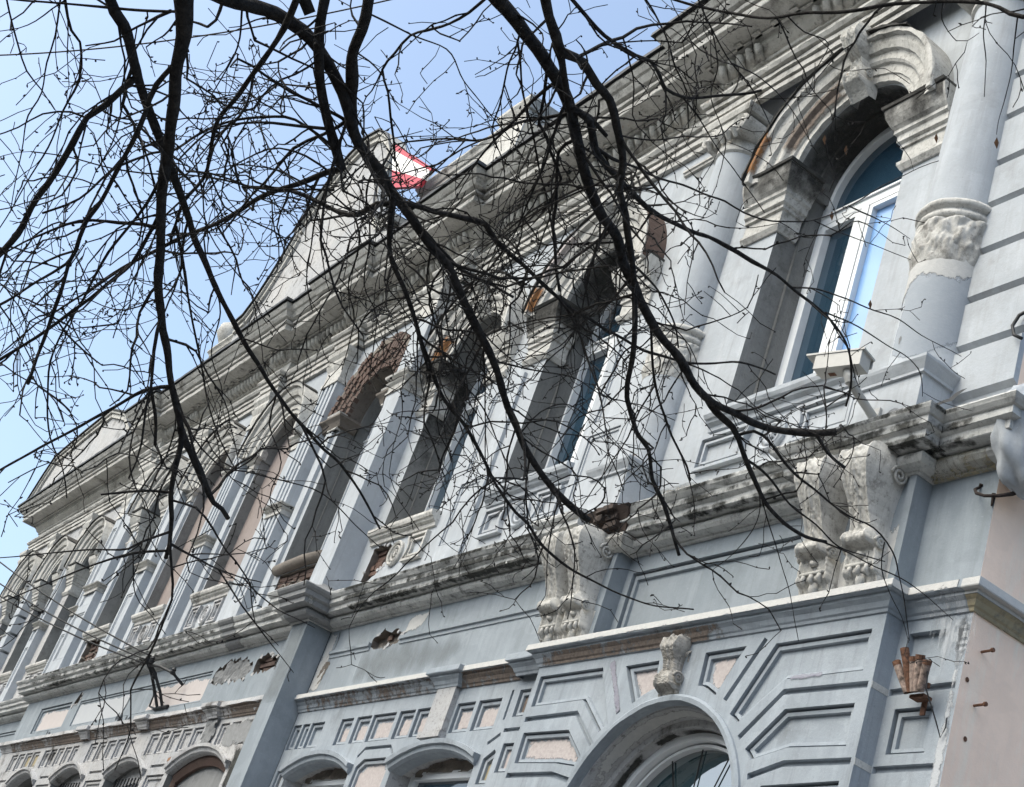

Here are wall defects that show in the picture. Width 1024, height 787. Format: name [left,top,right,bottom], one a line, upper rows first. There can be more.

peeling [902,258,974,305]
water stain [633,403,996,531]
water stain [344,531,541,610]
peeling [377,612,429,650]
peeling [525,578,959,651]
flaking render [251,651,279,676]
peeling [296,634,428,699]
peeling [462,659,508,671]
corrosion [892,647,932,667]